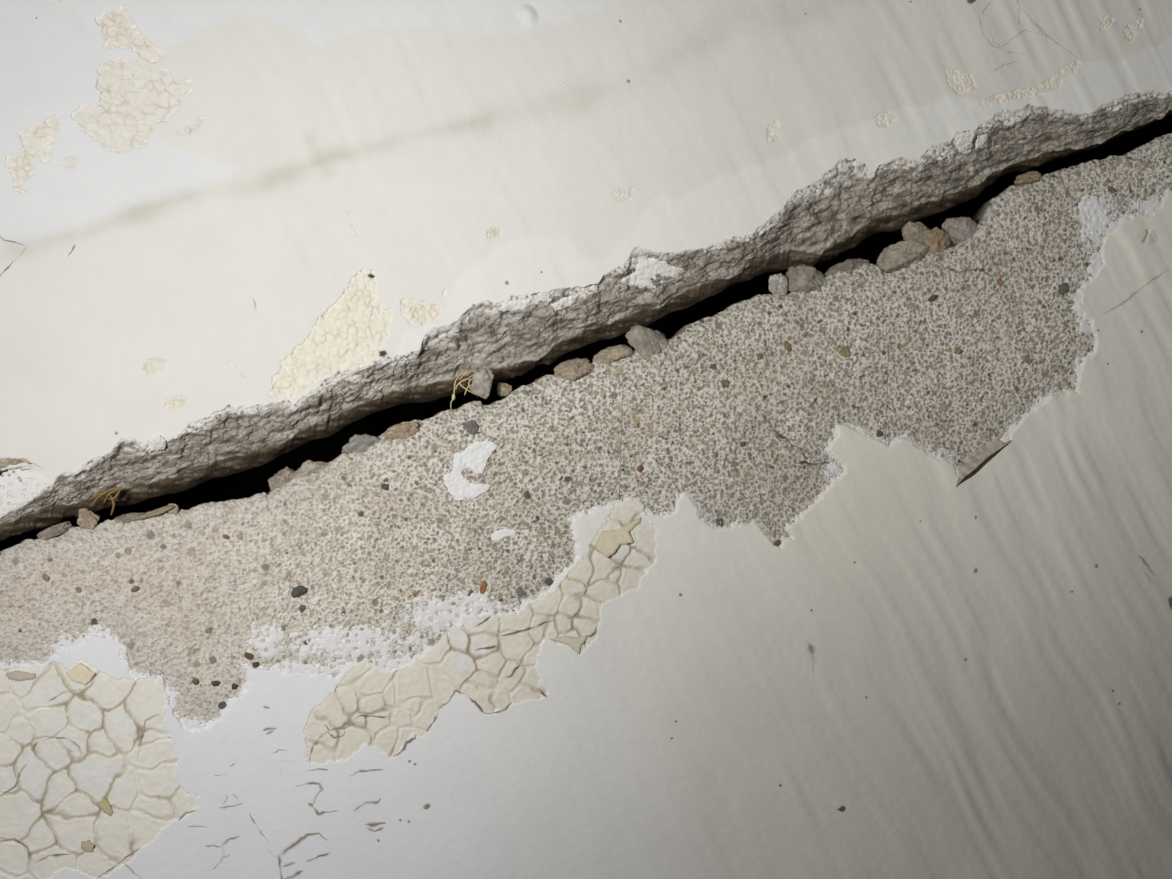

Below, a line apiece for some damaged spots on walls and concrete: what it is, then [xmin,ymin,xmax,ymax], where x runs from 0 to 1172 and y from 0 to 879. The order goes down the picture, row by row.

peeling [5,115,60,193]
peeling [96,7,164,62]
crack [0,90,1172,551]
flaking render [0,133,1172,730]